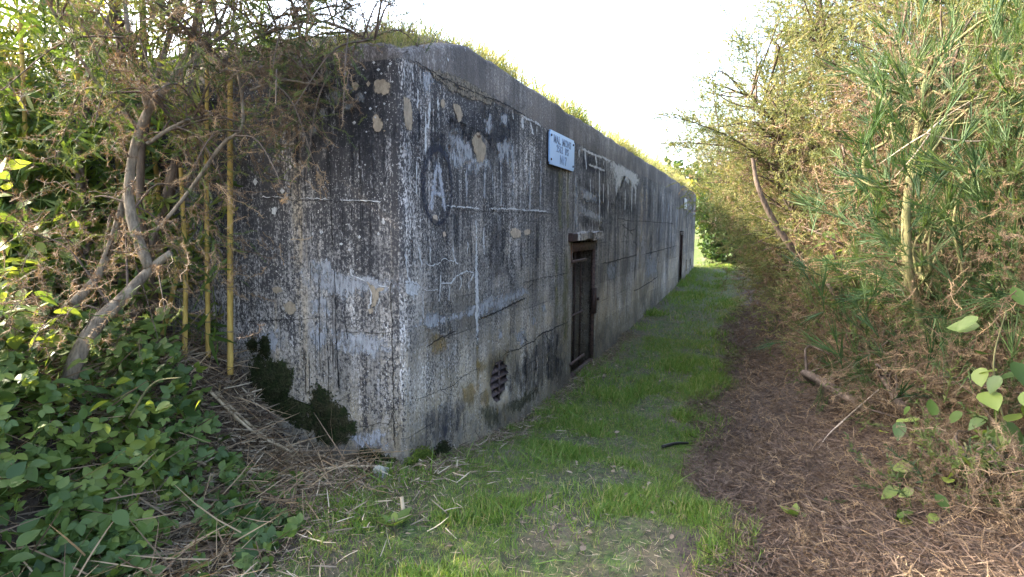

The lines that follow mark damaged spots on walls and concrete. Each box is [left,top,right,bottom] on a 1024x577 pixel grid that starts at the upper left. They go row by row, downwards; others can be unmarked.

spalling [351,79,391,95]
spalling [431,69,500,122]
spalling [373,114,385,132]
spalling [403,97,413,130]
efflorescence [403,57,449,195]
efflorescence [486,110,541,135]
spalling [472,132,486,163]
efflorescence [446,135,514,202]
water stain [300,221,532,398]
crack [479,273,567,320]
water stain [261,328,285,352]
crack [504,322,567,355]